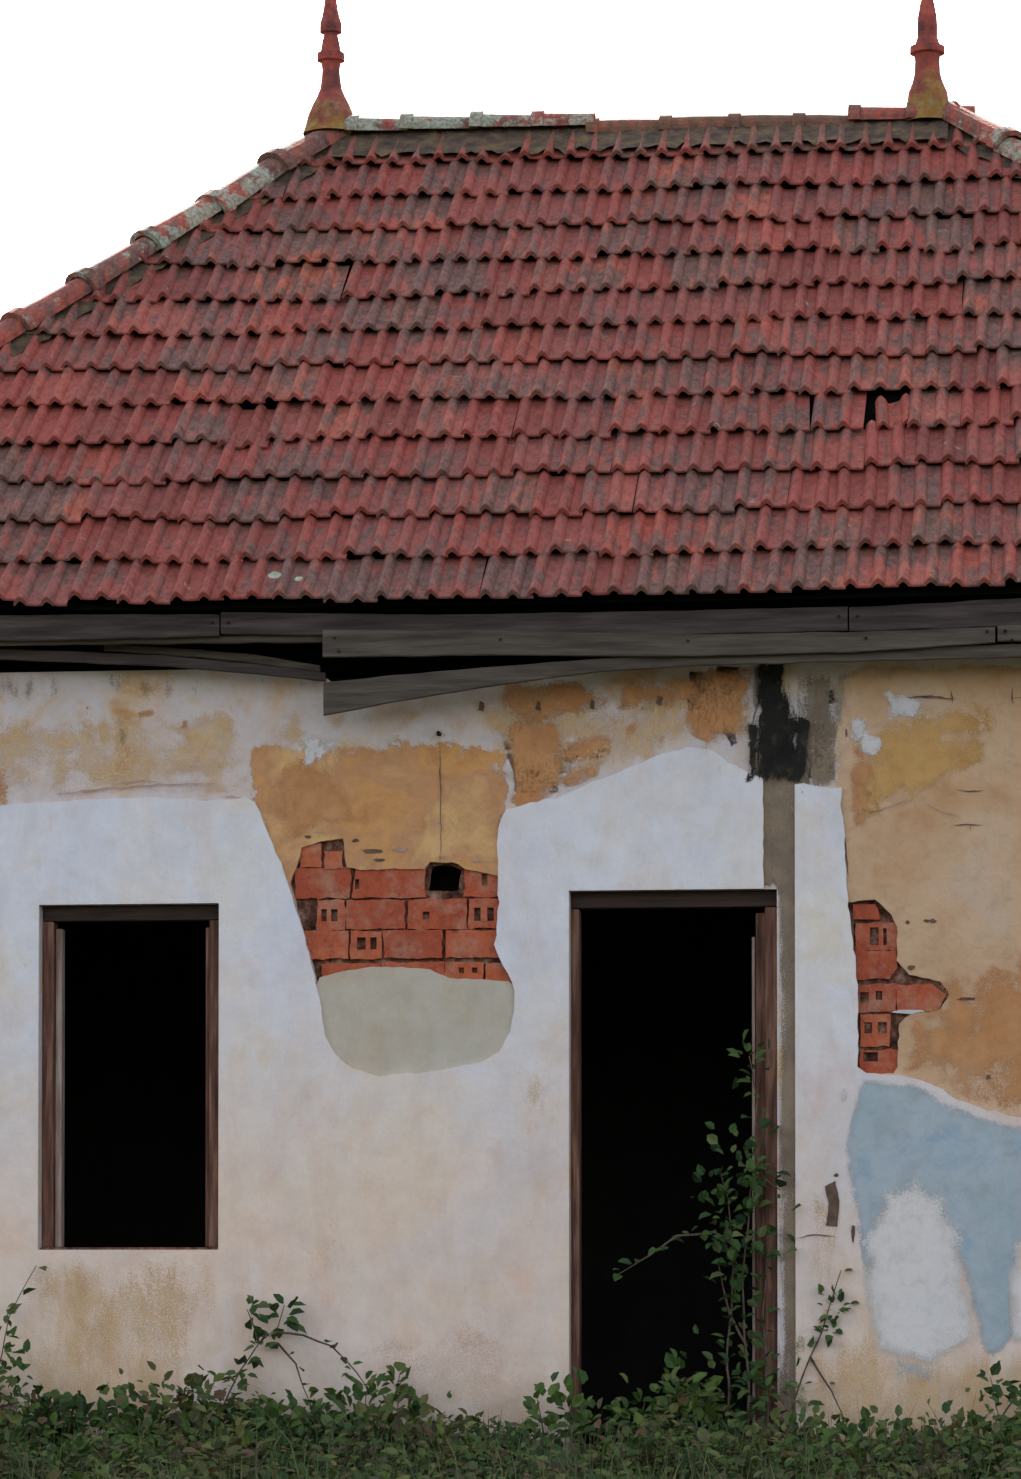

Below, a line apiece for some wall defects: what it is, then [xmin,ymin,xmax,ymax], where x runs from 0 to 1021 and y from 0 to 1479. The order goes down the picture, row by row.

spalling [875,393,918,430]
spalling [249,667,752,1076]
water stain [0,664,1021,1450]
peeling [825,1173,855,1242]
spalling [828,661,1021,1117]